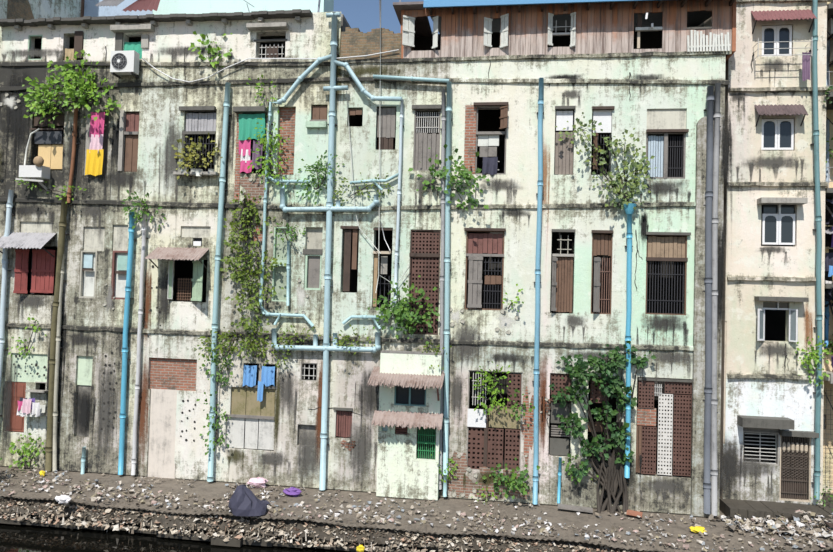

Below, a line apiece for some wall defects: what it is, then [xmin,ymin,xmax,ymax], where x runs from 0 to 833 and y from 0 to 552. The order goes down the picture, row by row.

peeling [7,0,34,20]
leakage [549,75,588,106]
leakage [760,60,795,96]
leakage [4,206,54,224]
leakage [637,316,690,375]
corrosion [805,311,813,342]
leakage [18,295,98,447]
leakage [73,370,117,454]
leakage [449,378,462,420]
leakage [718,442,773,494]